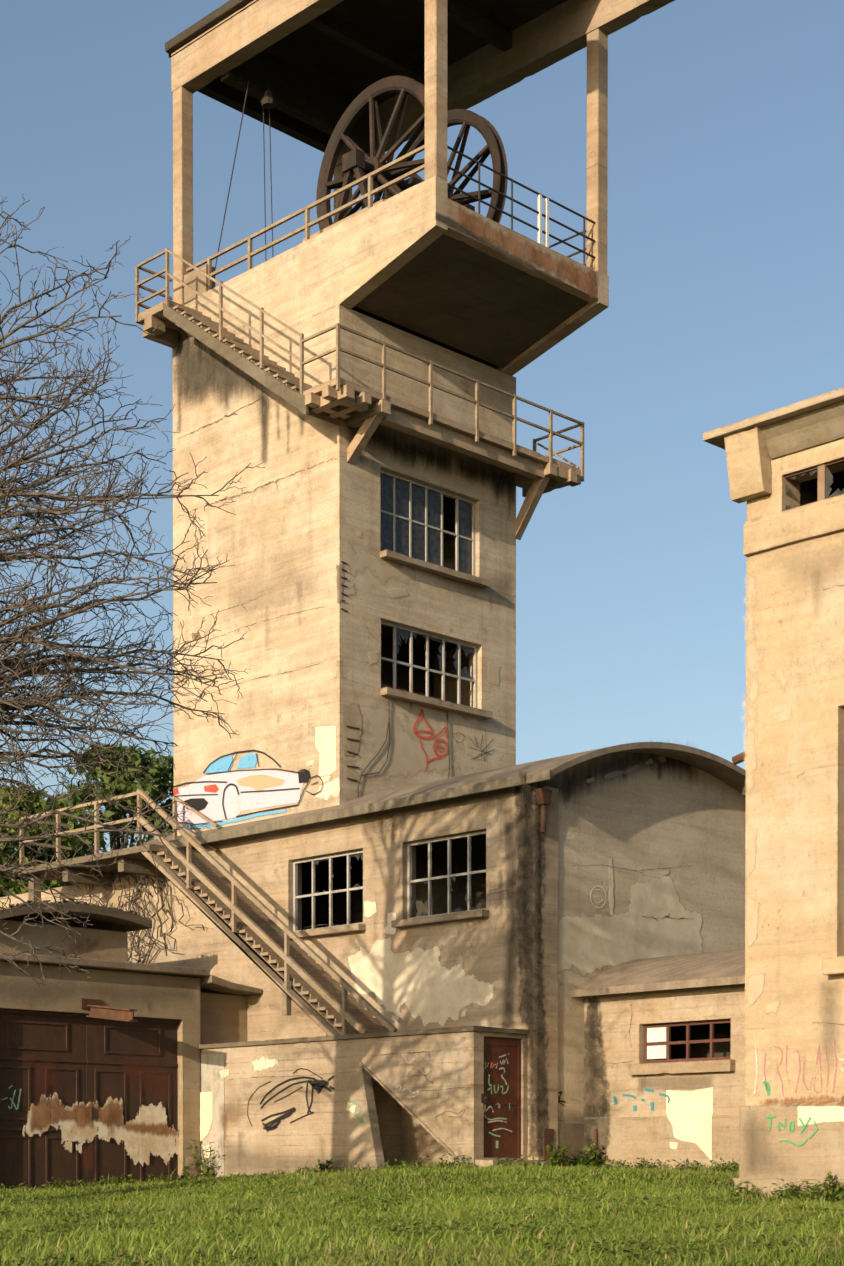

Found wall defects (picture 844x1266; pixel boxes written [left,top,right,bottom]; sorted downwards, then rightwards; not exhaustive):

corrosion [459,207,596,297]
leakage [176,332,268,460]
peeling [744,576,764,793]
peeling [747,826,757,874]
peeling [348,901,494,1027]
leakage [502,753,692,1163]
peeling [558,857,703,979]
peeling [747,897,760,947]
peeling [748,974,779,1014]
corrosion [31,1097,179,1136]
peeling [22,1092,211,1180]